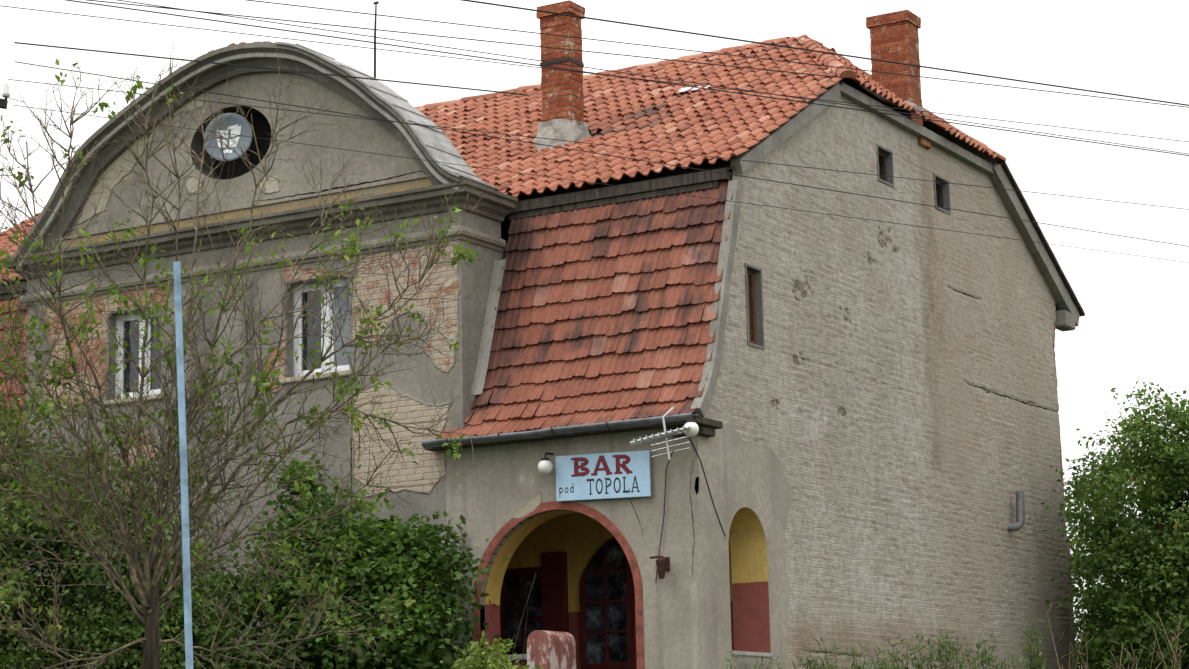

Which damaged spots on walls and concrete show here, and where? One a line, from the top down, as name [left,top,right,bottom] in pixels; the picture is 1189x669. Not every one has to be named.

peeling [259,240,462,396]
crack [964,381,1058,413]